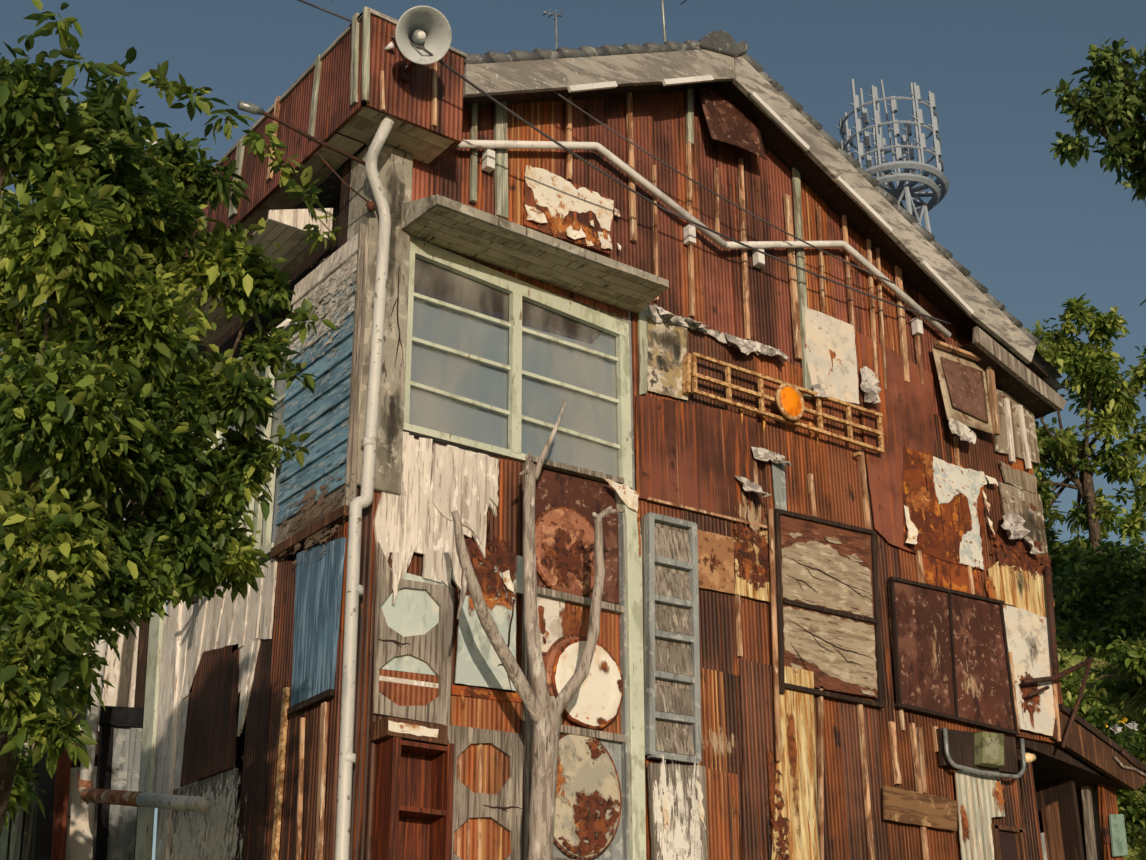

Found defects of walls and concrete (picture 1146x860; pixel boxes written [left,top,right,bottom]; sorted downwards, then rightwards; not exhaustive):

peeling [524,165,621,251]
corrosion [412,91,1059,860]
peeling [904,505,918,545]
peeling [932,456,998,570]
crack [786,556,872,600]
crack [786,618,874,669]
peeling [169,767,247,860]
peeling [652,755,706,860]